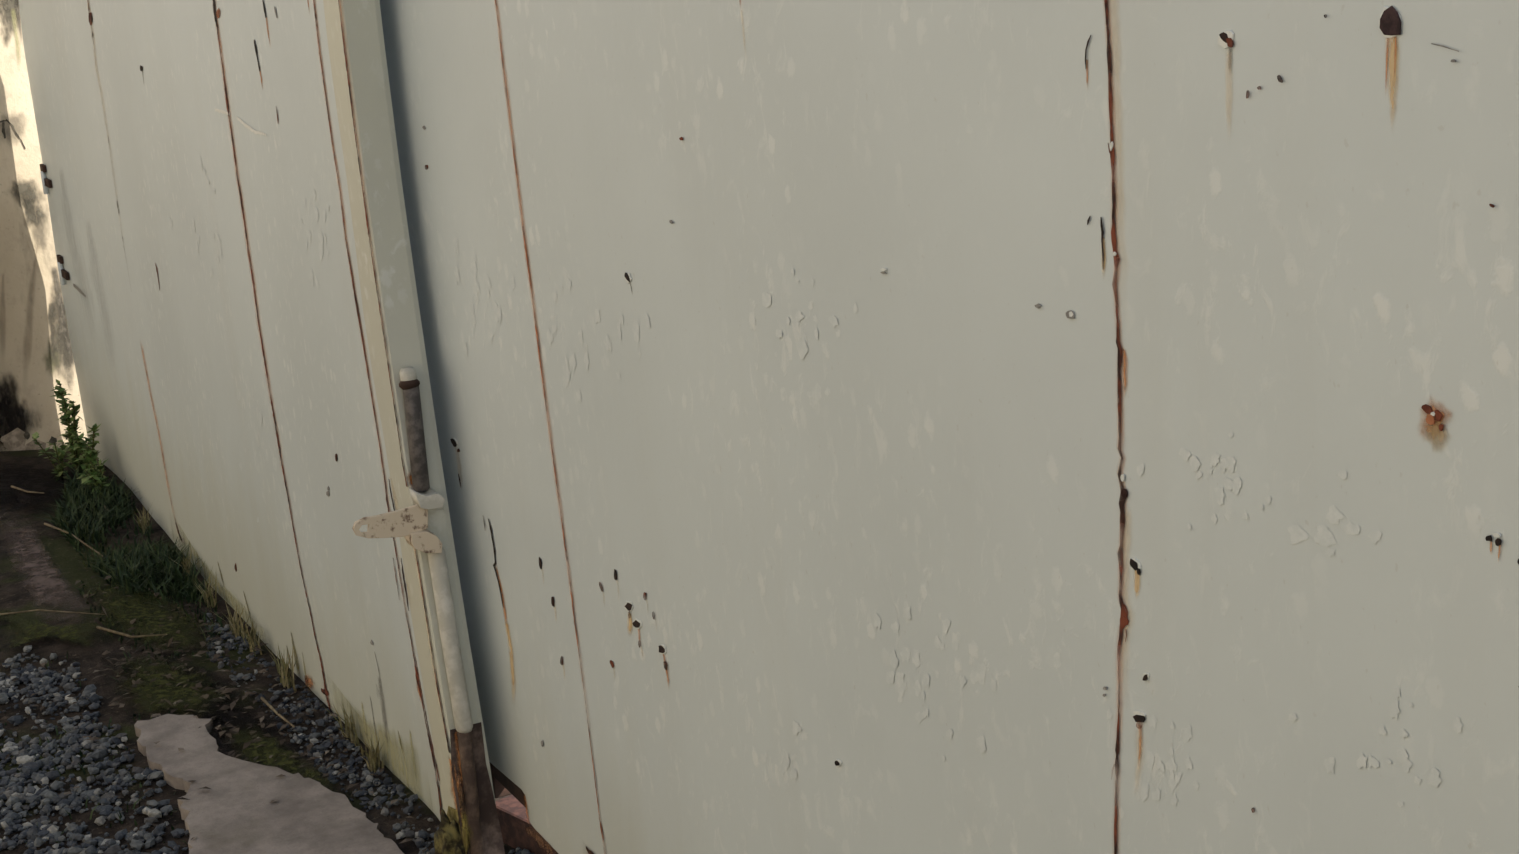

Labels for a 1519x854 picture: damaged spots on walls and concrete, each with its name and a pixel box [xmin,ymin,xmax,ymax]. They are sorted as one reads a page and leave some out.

water stain [0,0,21,54]
corrosion [1386,37,1396,103]
water stain [0,119,26,149]
water stain [13,183,45,225]
water stain [47,269,73,382]
corrosion [1421,404,1445,443]
corrosion [449,722,505,854]